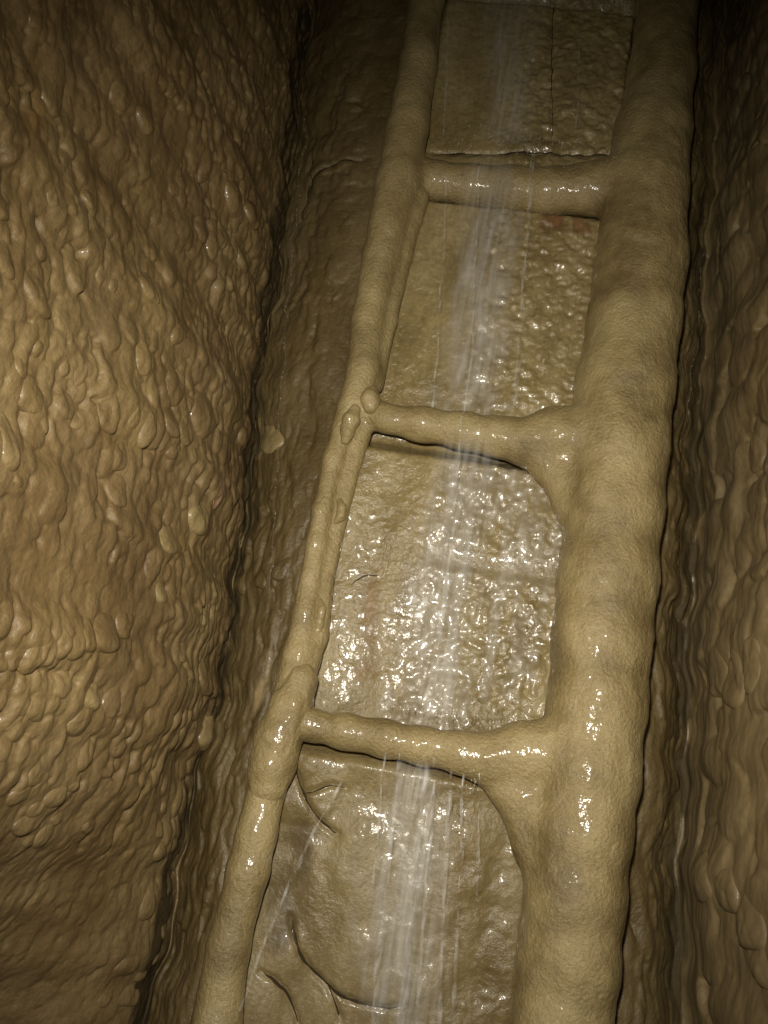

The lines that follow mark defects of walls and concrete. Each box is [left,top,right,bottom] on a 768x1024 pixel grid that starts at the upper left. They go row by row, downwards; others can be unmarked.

crack [432,3,609,157]
leakage [456,357,494,414]
leakage [410,451,558,728]
leakage [378,791,431,975]